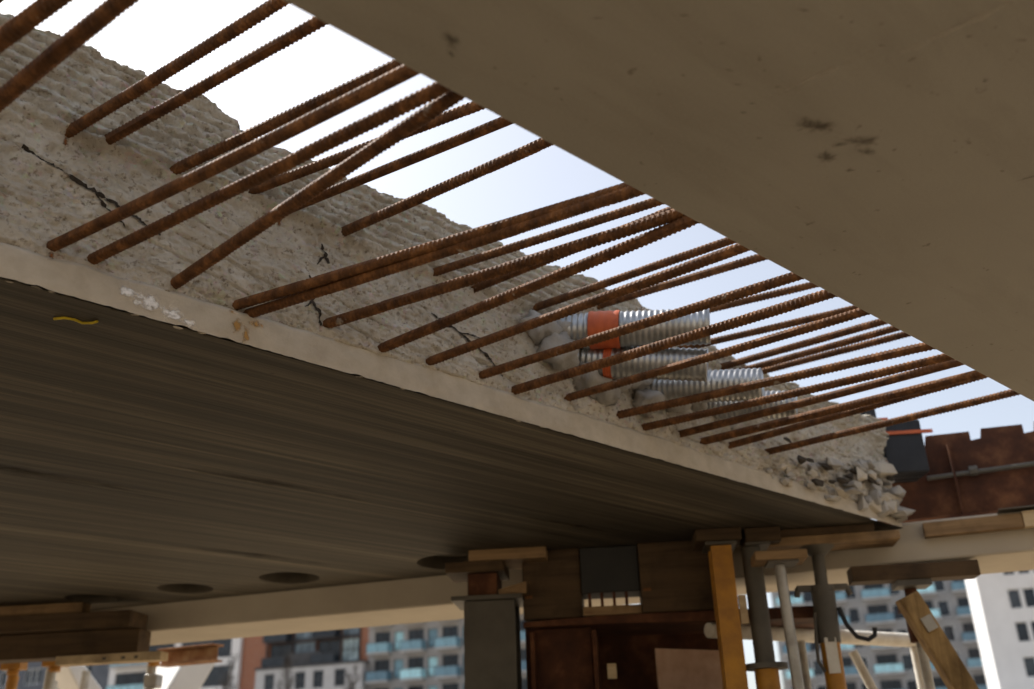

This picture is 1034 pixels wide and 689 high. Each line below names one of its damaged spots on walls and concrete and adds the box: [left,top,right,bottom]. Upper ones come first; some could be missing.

spalling [0,0,139,113]
spalling [64,0,329,145]
crack [21,144,161,235]
spalling [46,59,514,290]
spalling [341,138,553,238]
spalling [232,182,768,365]
spalling [479,272,1021,523]